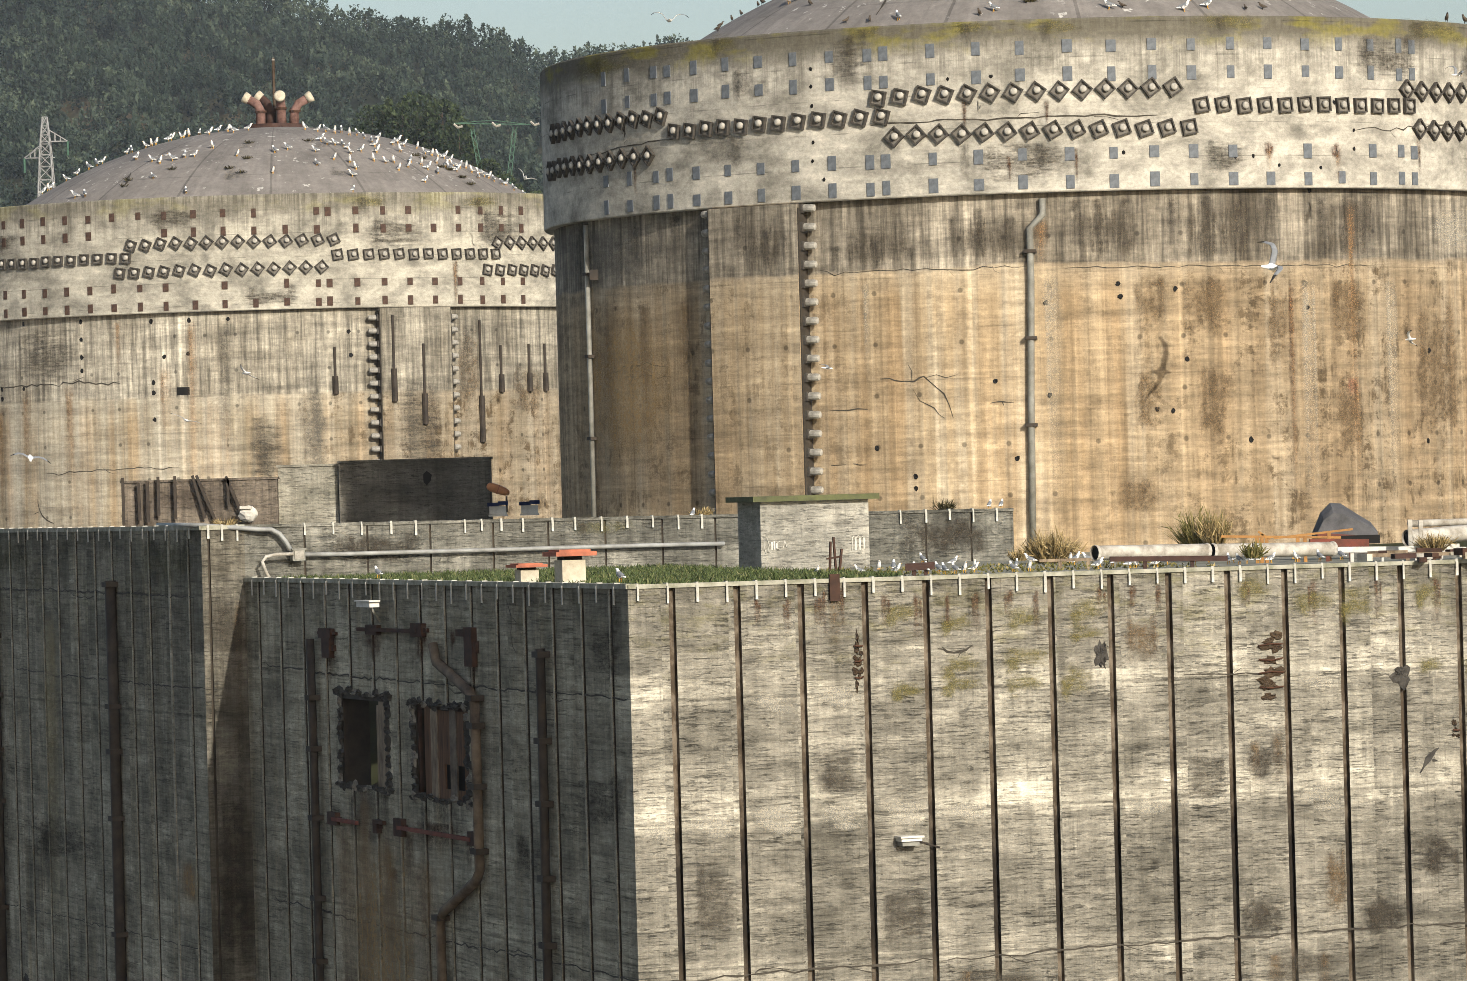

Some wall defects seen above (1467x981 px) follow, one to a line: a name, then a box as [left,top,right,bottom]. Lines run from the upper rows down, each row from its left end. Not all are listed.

leakage [948,211,1014,256]
leakage [1072,200,1132,253]
leakage [1169,198,1257,252]
crack [1,377,120,396]
crack [883,365,955,418]
leakage [1419,307,1460,427]
leakage [251,427,281,476]